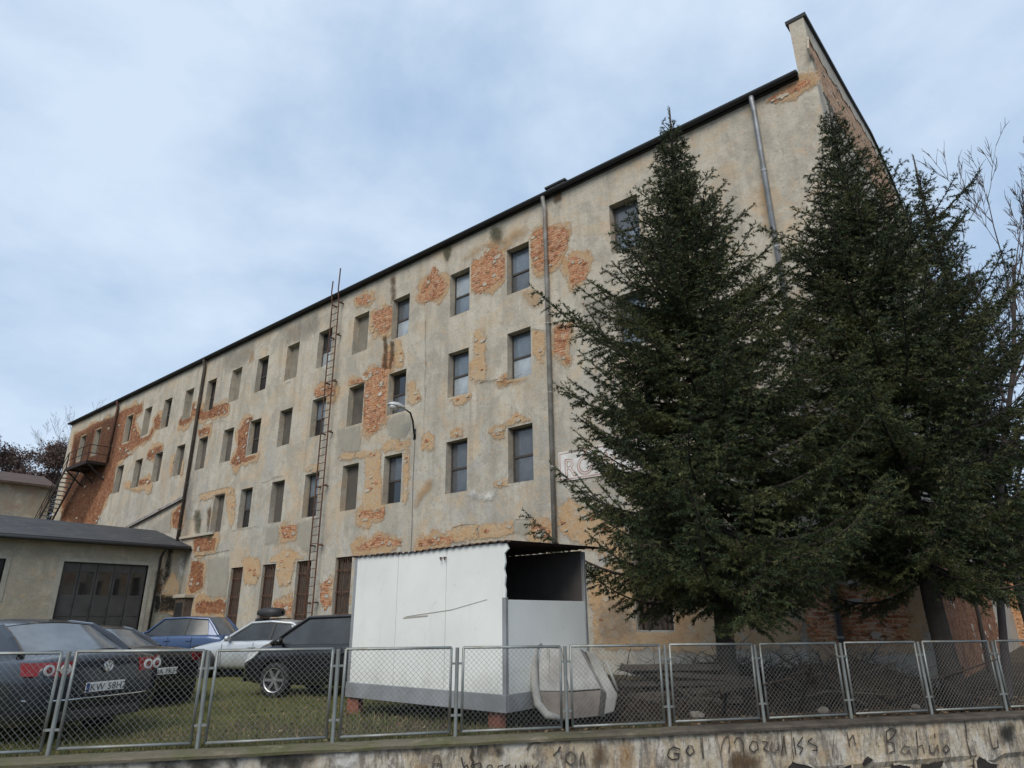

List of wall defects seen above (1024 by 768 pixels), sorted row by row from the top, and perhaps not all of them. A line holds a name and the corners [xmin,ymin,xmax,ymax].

flaking render [766,37,895,222]
flaking render [416,266,450,305]
flaking render [471,243,510,295]
flaking render [530,221,594,292]
damp [382,336,394,368]
flaking render [60,400,184,524]
flaking render [158,413,259,618]
peeling [314,290,716,657]